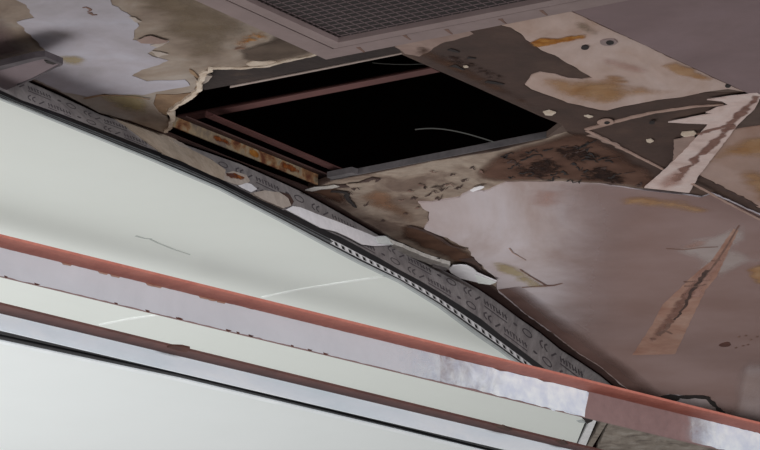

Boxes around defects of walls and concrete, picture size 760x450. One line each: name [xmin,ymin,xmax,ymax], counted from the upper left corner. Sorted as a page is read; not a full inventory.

peeling [404,25,749,179]
water stain [552,78,645,101]
peeling [686,175,760,213]
crack [135,235,190,255]
peeling [285,206,397,246]
peeling [449,264,497,285]
water stain [469,135,760,415]
crack [656,225,740,336]
flaking render [660,395,726,414]